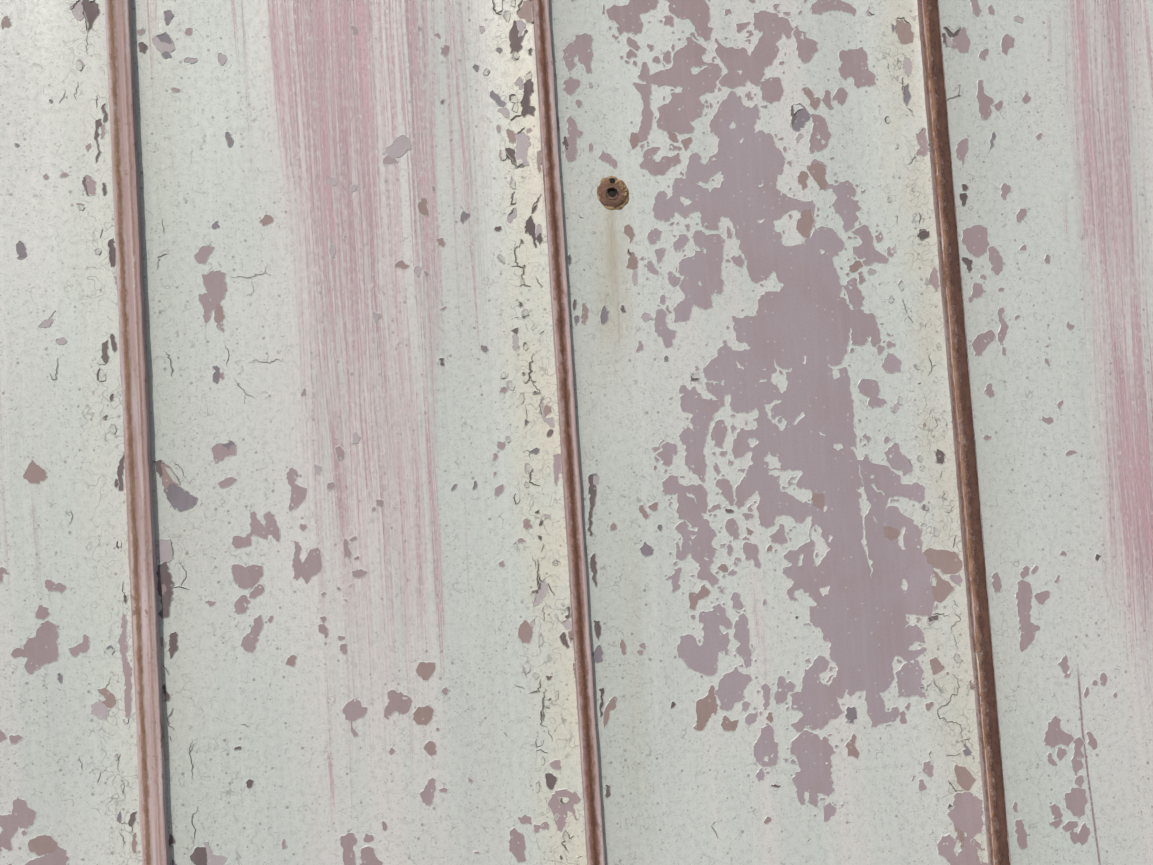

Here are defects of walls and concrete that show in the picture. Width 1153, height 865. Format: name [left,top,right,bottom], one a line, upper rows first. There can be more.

peeling [69,0,101,71]
peeling [492,0,534,61]
peeling [43,96,109,210]
rust [597,176,629,210]
peeling [602,0,963,823]
peeling [231,467,323,585]
peeling [10,579,91,684]
peeling [230,564,274,654]
peeling [0,797,70,865]
peeling [508,738,582,864]
peeling [911,742,989,865]
peeling [1043,715,1098,846]